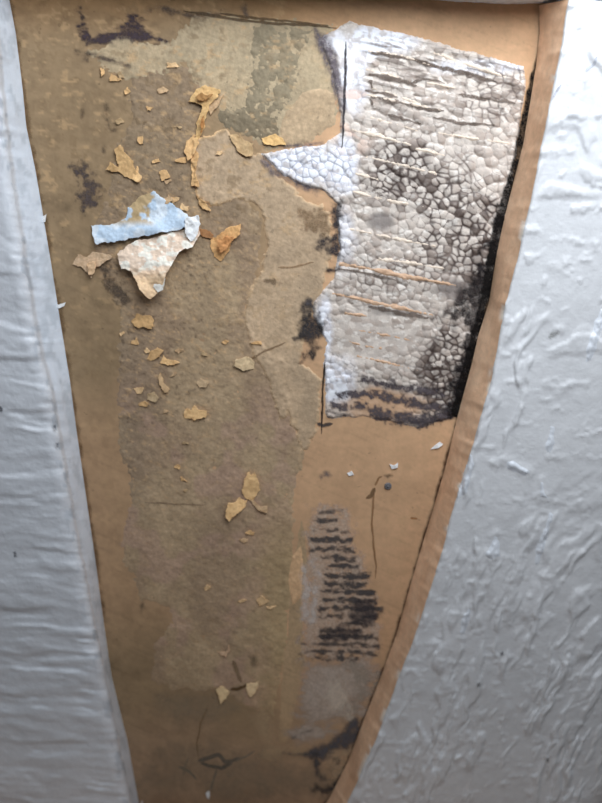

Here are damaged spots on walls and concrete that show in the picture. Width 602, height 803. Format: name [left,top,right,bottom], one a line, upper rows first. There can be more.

water stain [315,29,346,109]
peeling [229,134,286,157]
peeling [73,85,241,299]
water stain [299,202,342,256]
peeling [131,313,154,329]
water stain [294,299,323,364]
water stain [329,217,496,429]
peeling [134,347,184,407]
peeling [233,356,255,371]
peeling [184,405,207,421]
peeling [225,472,268,522]
water stain [288,511,384,794]